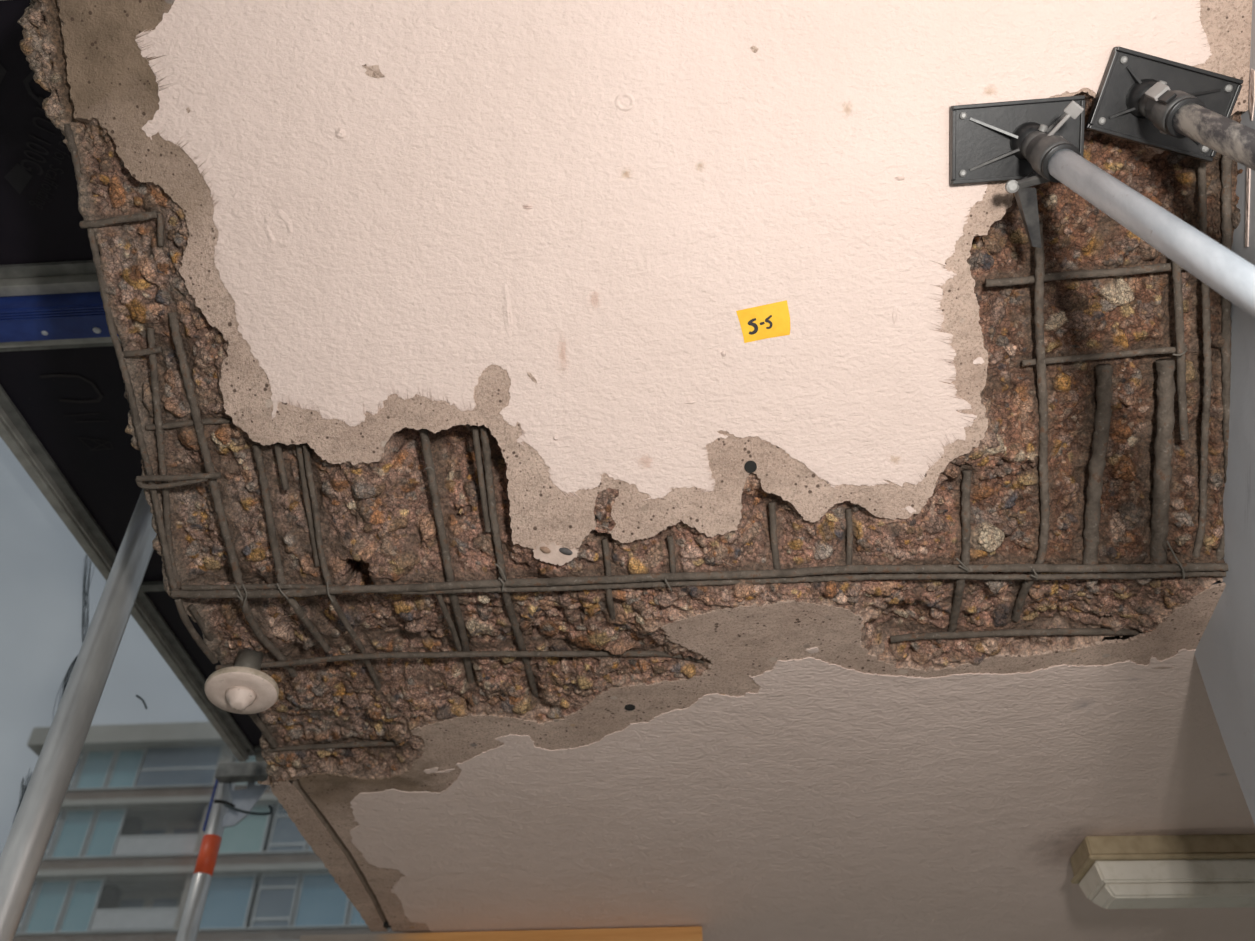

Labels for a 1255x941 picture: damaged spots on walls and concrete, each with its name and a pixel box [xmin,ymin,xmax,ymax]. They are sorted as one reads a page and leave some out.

peeling [17,0,1014,671]
spalling [248,181,1232,933]
spalling [1049,88,1251,250]
peeling [1193,0,1255,123]